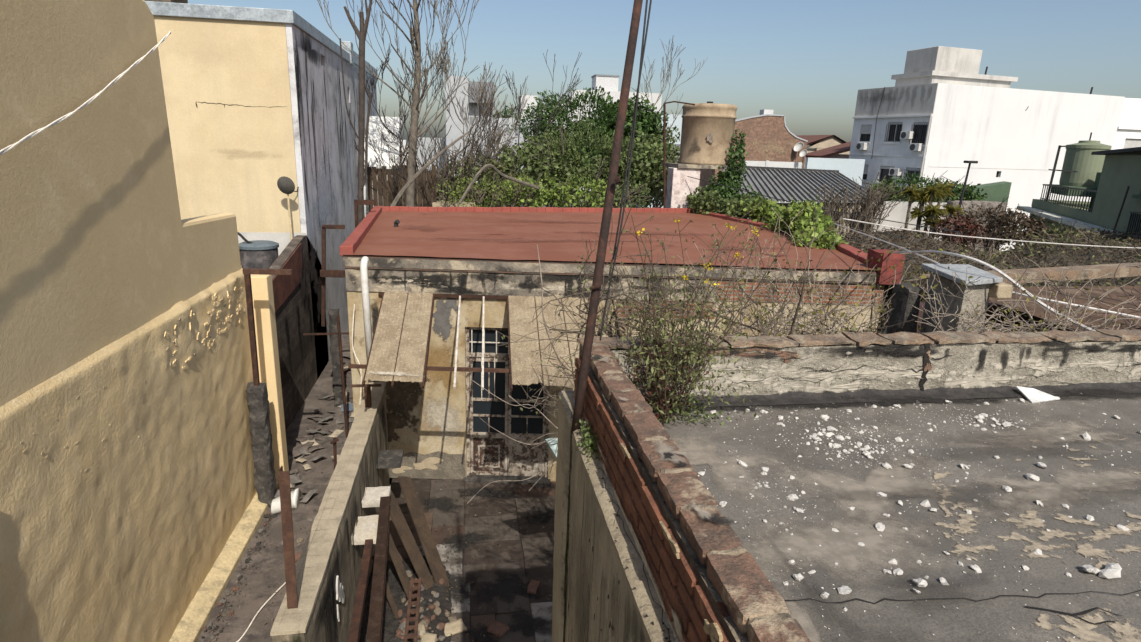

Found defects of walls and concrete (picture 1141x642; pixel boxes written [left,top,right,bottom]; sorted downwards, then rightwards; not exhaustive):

crack [196,101,286,109]
water stain [295,36,368,208]
water stain [426,348,454,387]
water stain [672,347,741,360]
crack [732,343,955,391]
water stain [825,344,950,358]
water stain [976,350,987,371]
crack [1016,350,1106,385]
water stain [1002,341,1141,369]
peeling [1066,440,1101,467]
peeling [929,472,1141,570]
peeling [1035,603,1141,642]